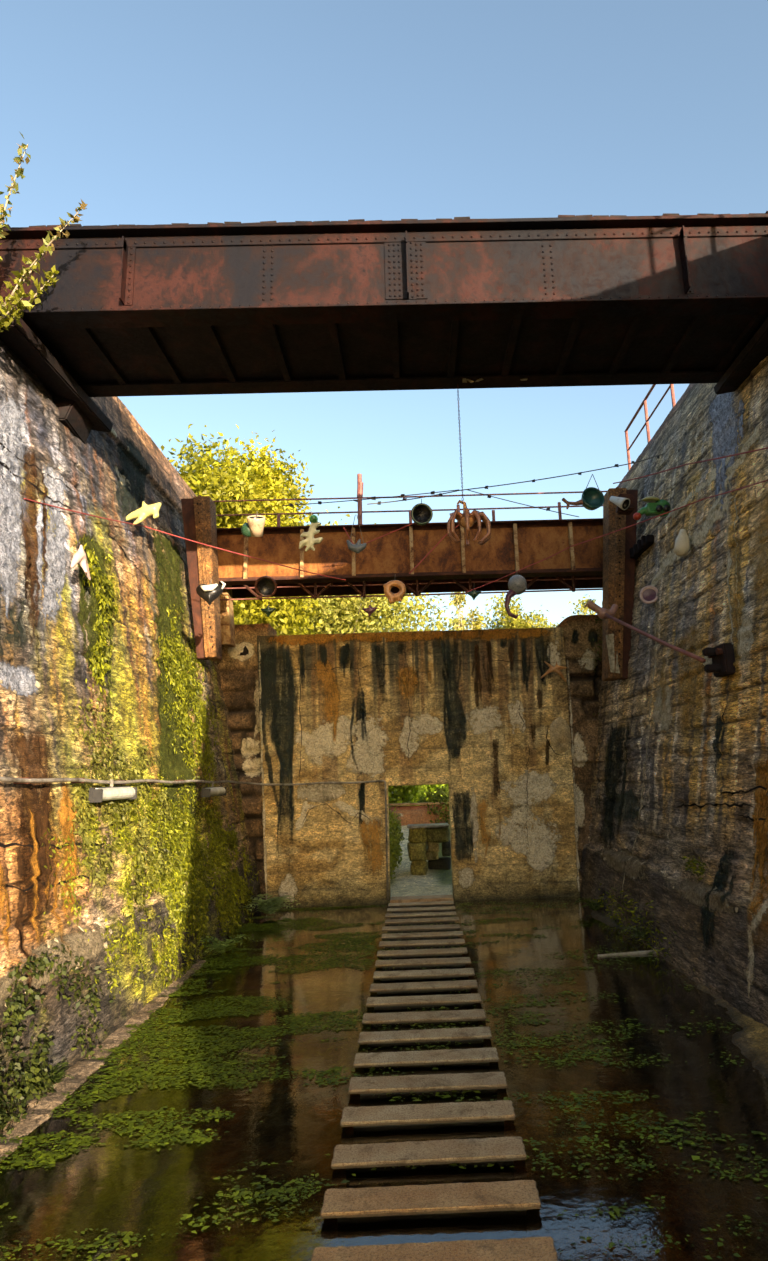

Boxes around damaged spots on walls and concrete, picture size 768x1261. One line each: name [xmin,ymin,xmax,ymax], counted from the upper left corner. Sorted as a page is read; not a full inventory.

water stain [115,436,150,520]
water stain [0,396,114,696]
water stain [254,643,367,901]
peeling [294,713,443,777]
water stain [374,642,404,697]
water stain [439,640,467,770]
water stain [452,788,479,889]
water stain [500,638,551,692]
peeling [495,770,562,872]
water stain [571,629,598,646]
rust [748,754,768,942]